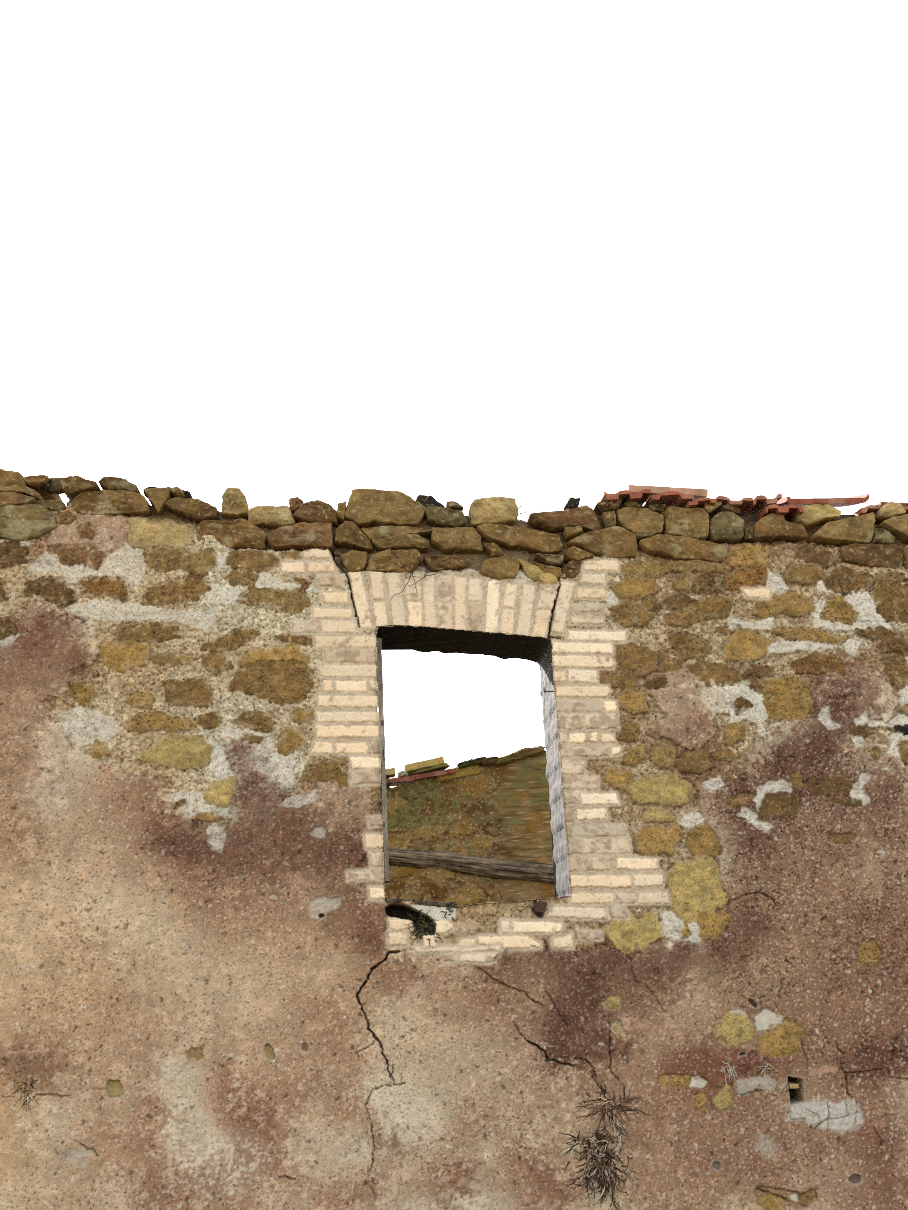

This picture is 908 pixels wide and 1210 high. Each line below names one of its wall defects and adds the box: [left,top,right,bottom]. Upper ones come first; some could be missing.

peeling [0,502,908,970]
crack [356,950,406,1202]
crack [479,949,620,1092]
spalling [657,1073,777,1112]
spalling [715,1006,806,1057]